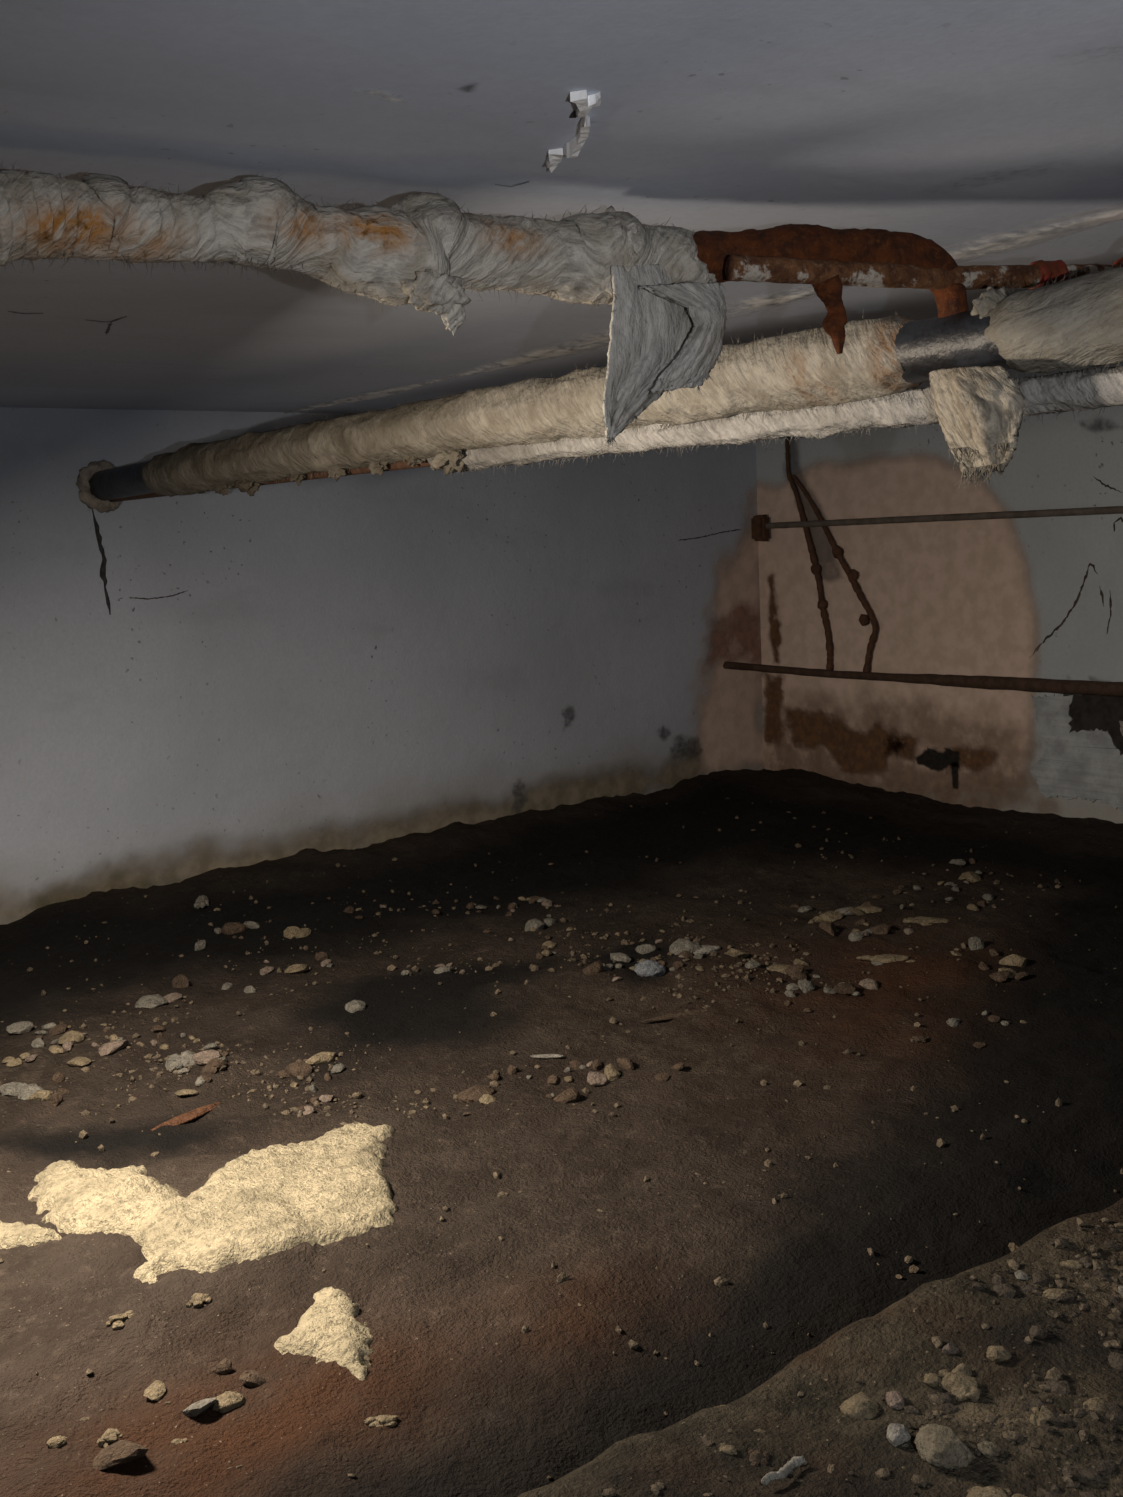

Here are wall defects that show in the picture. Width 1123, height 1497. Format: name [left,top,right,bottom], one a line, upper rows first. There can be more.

crack [1094,477,1123,532]
crack [92,509,186,615]
peeling [661,455,1123,812]
crack [1032,563,1112,656]
leakage [0,753,701,920]